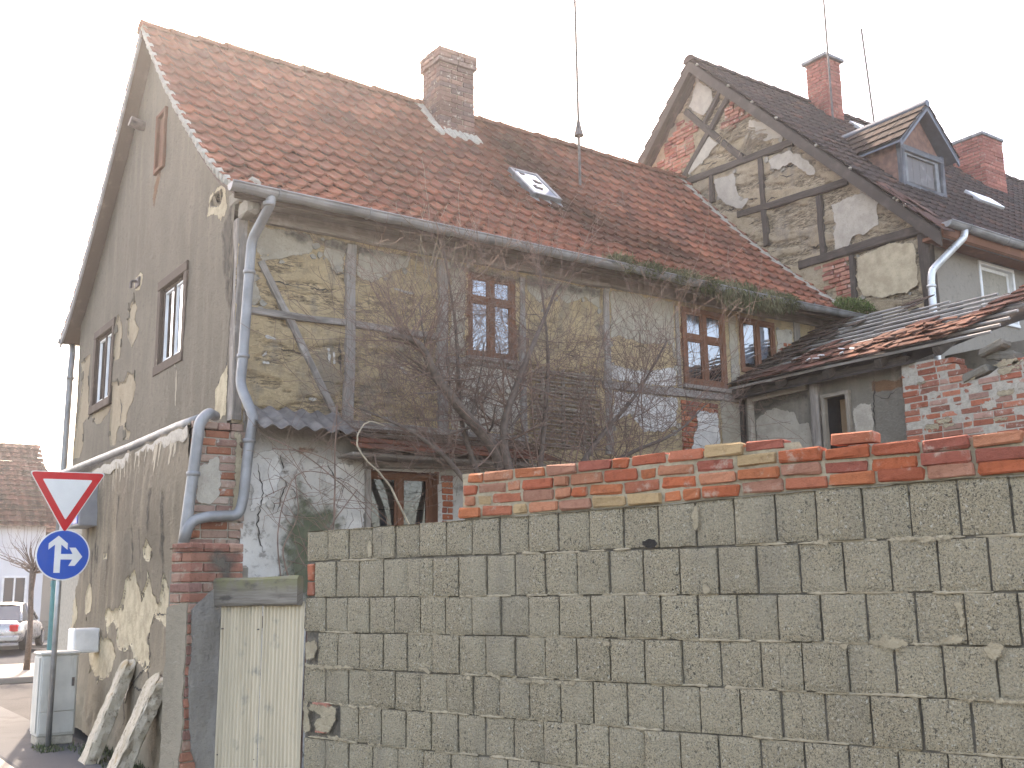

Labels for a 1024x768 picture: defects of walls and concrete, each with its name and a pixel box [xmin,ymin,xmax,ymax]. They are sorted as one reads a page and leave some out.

flaking render [657,78,815,176]
spalling [207,185,227,222]
flaking render [714,169,748,209]
flaking render [814,190,918,303]
flaking render [113,272,143,361]
flaking render [73,354,136,459]
flaking render [756,408,813,448]
spalling [993,358,1023,375]
flaking render [196,457,222,505]
crack [256,455,297,552]
flaking render [88,539,169,684]